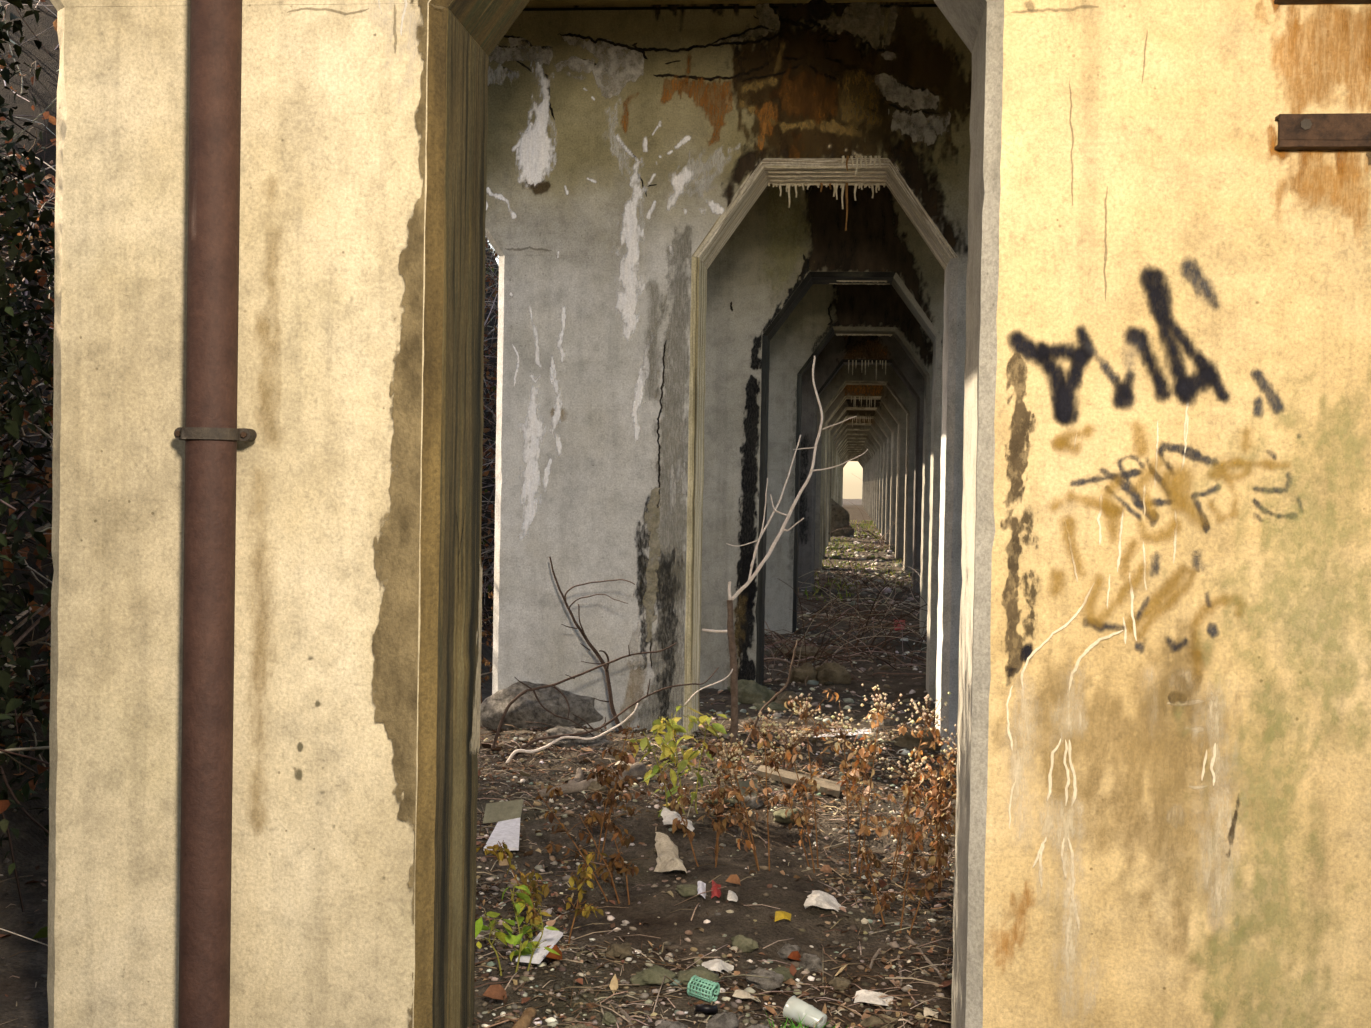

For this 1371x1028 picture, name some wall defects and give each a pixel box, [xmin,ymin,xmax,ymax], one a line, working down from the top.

water stain [486,187,516,219]
water stain [512,58,569,195]
spalling [488,36,644,98]
crack [489,3,940,131]
spalling [717,3,780,47]
rust [661,44,857,158]
spalling [814,2,898,50]
rust [1268,126,1371,220]
water stain [512,306,566,540]
water stain [607,0,972,736]
water stain [1001,353,1147,995]
water stain [1201,698,1239,913]